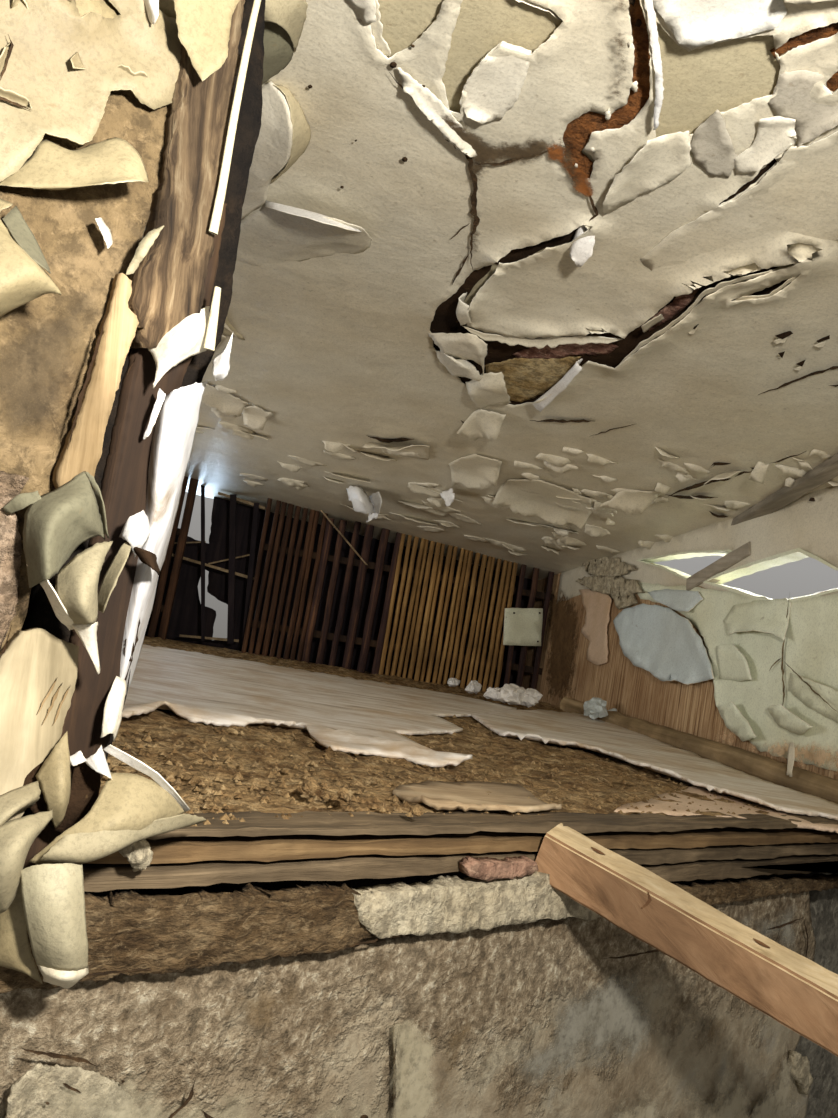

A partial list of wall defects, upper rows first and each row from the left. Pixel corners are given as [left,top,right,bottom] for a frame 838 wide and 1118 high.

peeling [0,0,240,318]
peeling [236,0,372,266]
peeling [348,0,391,58]
crack [389,67,552,284]
peeling [459,41,532,124]
peeling [516,0,562,21]
crack [589,196,599,221]
rust [548,0,650,197]
peeling [602,0,838,271]
rust [770,22,838,59]
peeling [240,225,838,777]
peeling [0,306,272,989]